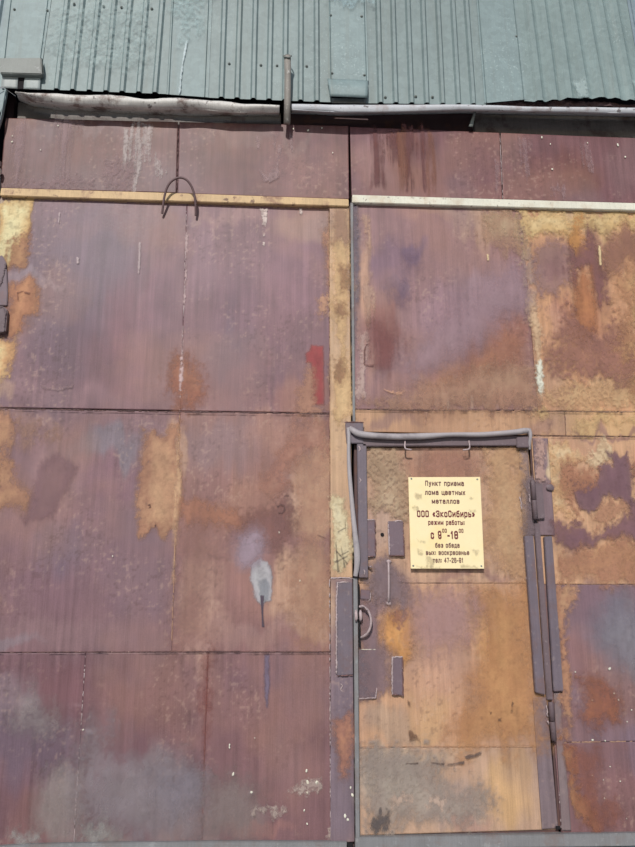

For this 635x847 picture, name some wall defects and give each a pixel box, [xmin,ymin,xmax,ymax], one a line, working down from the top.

corrosion [373,123,436,191]
corrosion [6,227,39,338]
corrosion [533,215,635,307]
corrosion [335,360,346,383]
corrosion [0,411,30,510]
corrosion [136,423,182,538]
corrosion [551,458,635,550]
corrosion [378,607,413,661]
corrosion [458,586,543,753]
corrosion [556,582,620,729]